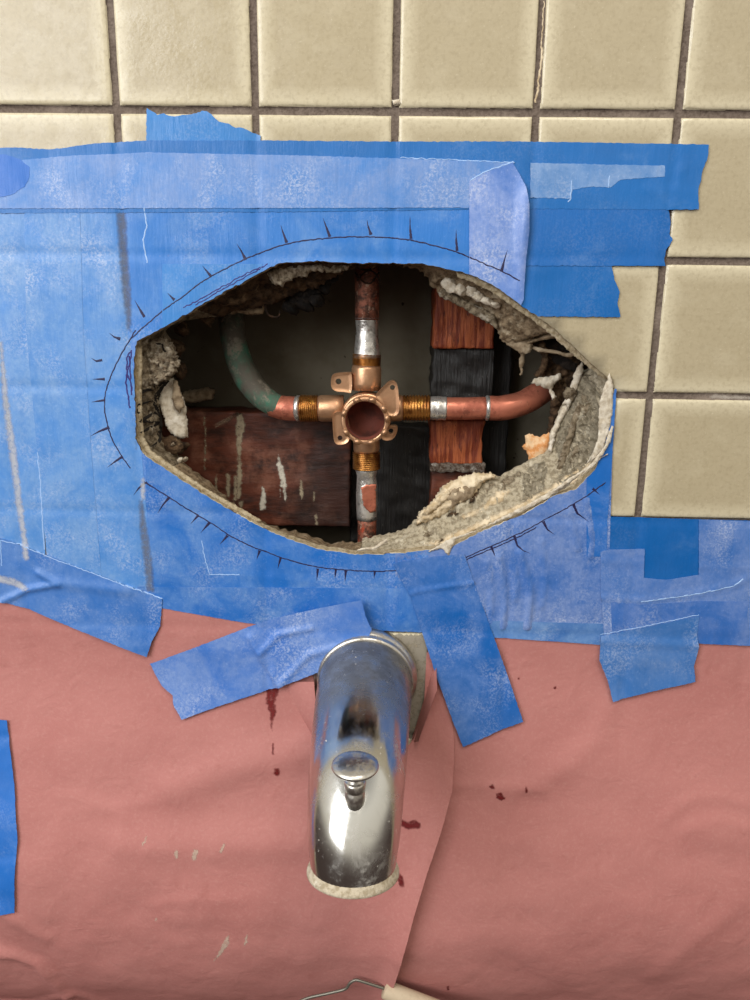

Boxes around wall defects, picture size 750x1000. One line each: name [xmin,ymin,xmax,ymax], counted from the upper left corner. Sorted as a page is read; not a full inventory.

spalling [136,261,614,555]